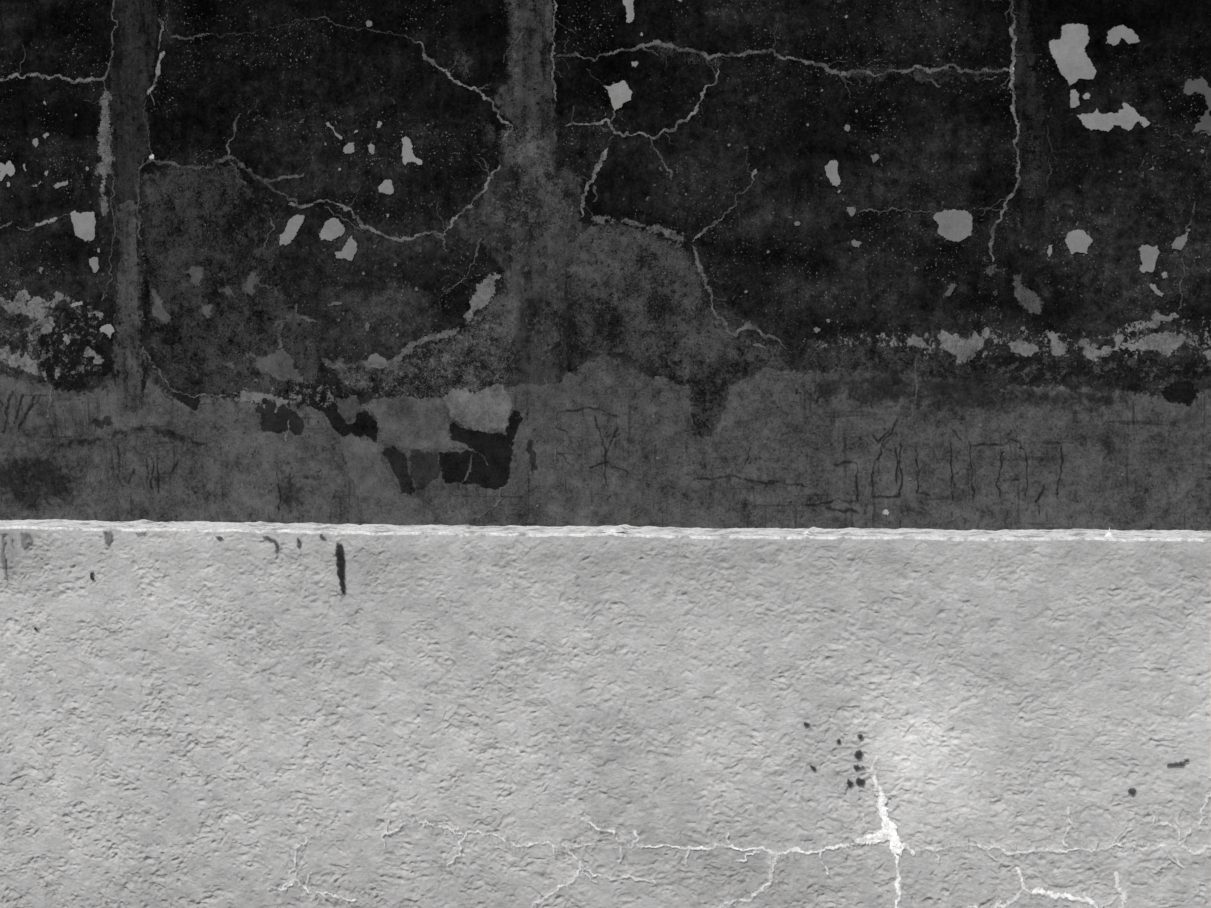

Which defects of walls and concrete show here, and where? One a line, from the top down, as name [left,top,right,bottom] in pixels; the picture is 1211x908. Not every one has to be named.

crack [0,0,118,104]
peeling [603,80,632,111]
peeling [1049,23,1150,132]
crack [0,214,68,231]
crack [101,0,1054,376]
peeling [933,209,973,242]
crack [1152,125,1211,310]
flaking render [0,301,115,392]
flaking render [143,162,515,495]
flaking render [565,222,1211,438]
flaking render [438,411,538,491]
crack [381,756,1211,908]